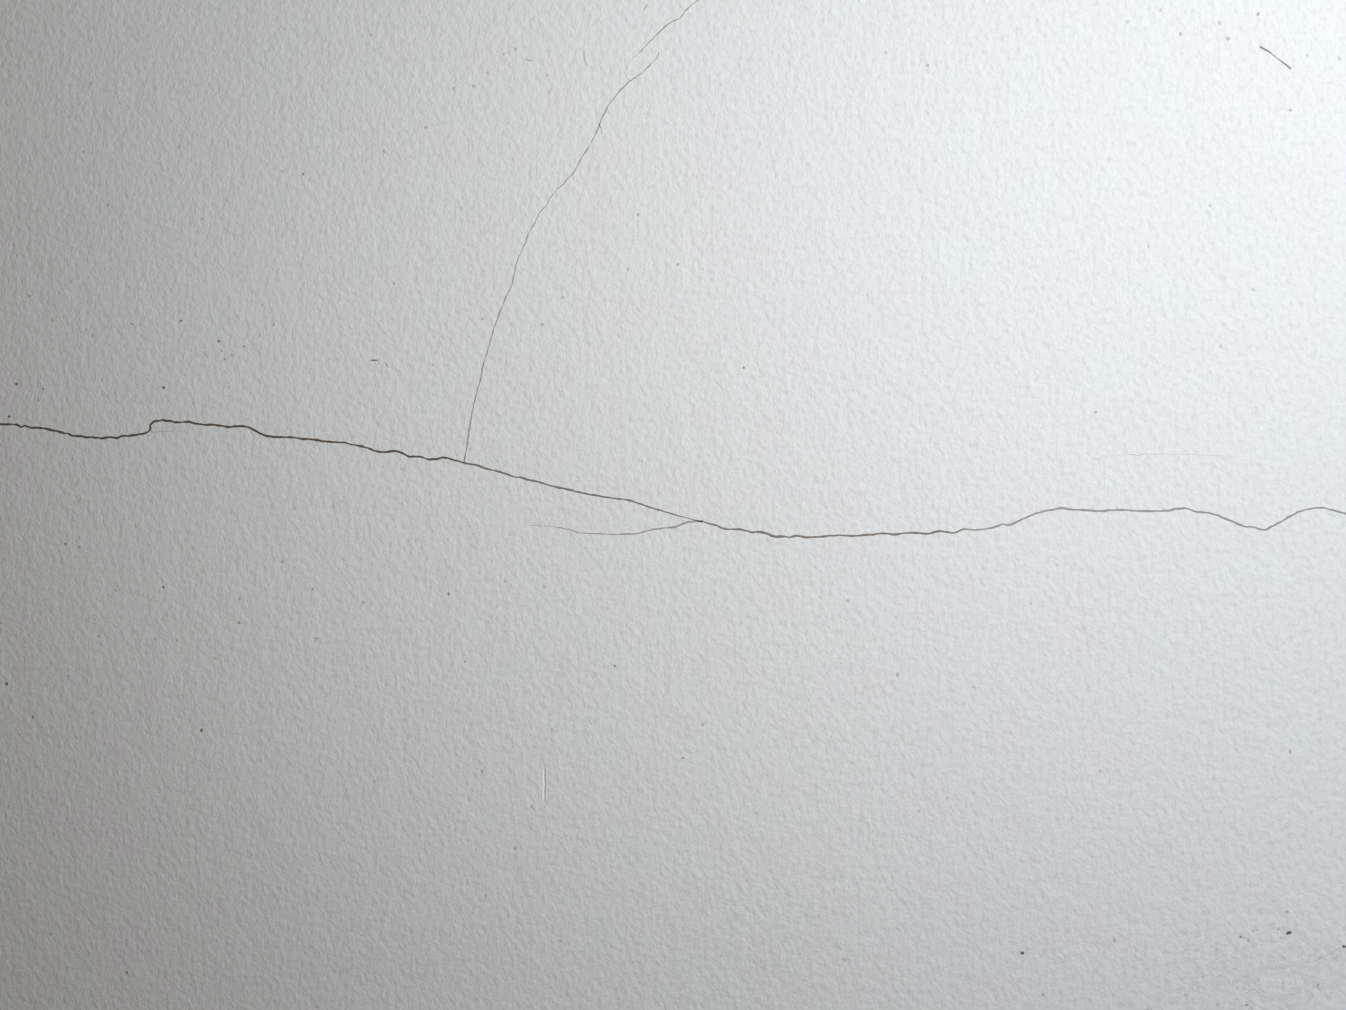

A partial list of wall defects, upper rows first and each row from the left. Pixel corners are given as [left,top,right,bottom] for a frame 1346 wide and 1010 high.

crack [0,0,1346,539]